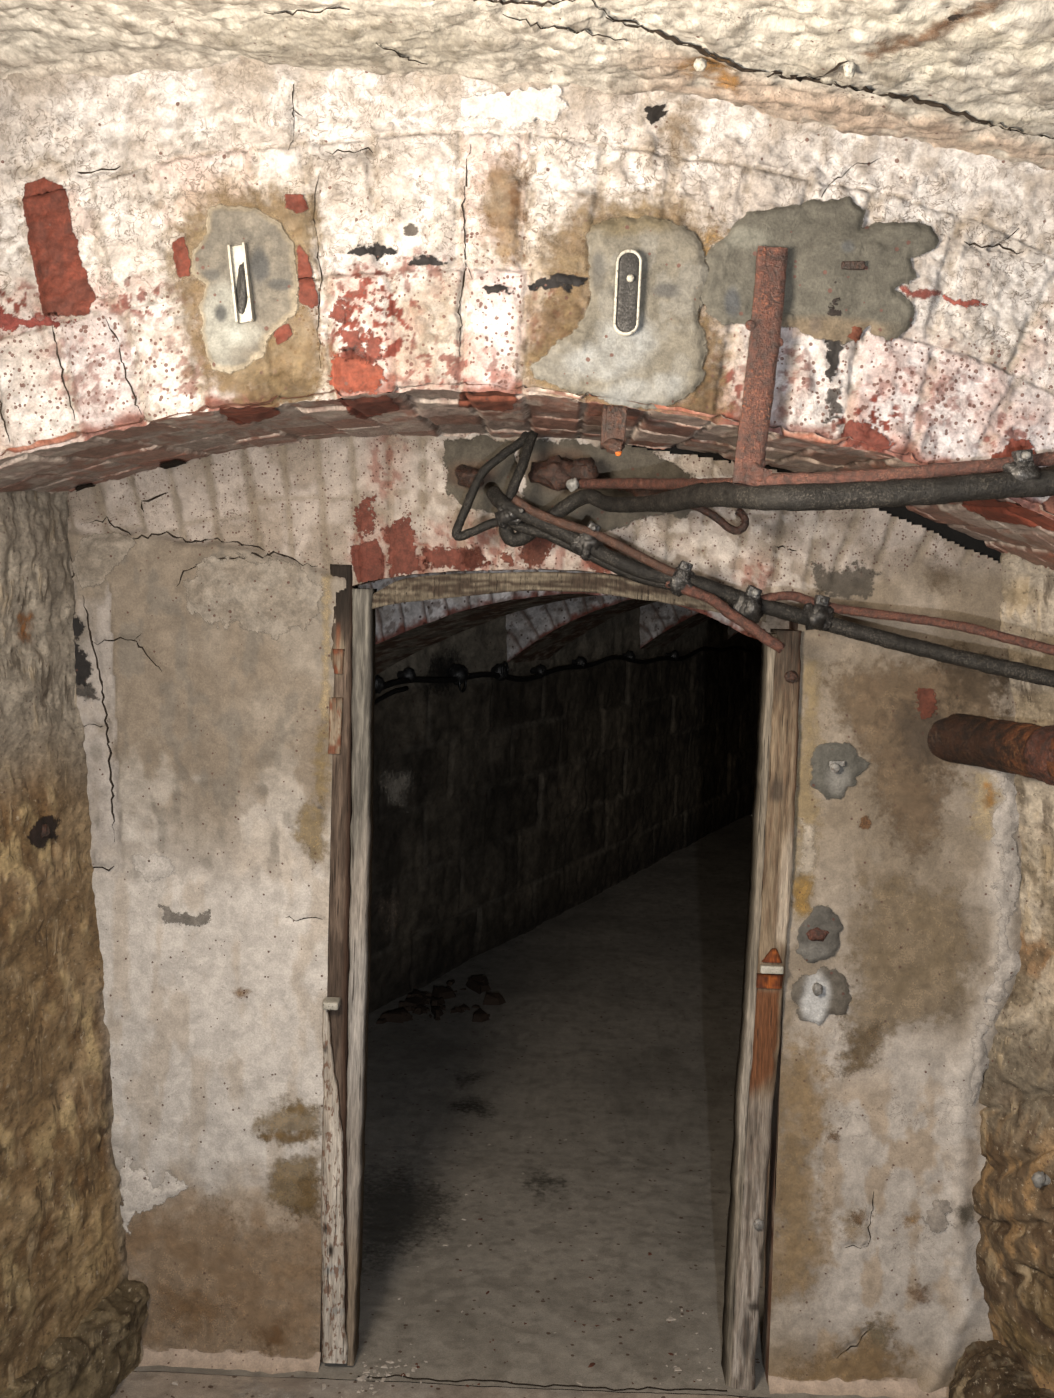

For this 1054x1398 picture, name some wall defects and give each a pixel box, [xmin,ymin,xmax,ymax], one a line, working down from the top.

crack [473,0,1054,139]
spalling [285,194,309,214]
spalling [0,177,96,332]
spalling [172,236,191,278]
spalling [274,324,292,345]
peeling [841,419,895,453]
peeling [991,436,1036,473]
crack [83,492,315,586]
crack [70,557,162,871]
flaking render [158,904,211,927]
damp [125,1104,322,1358]